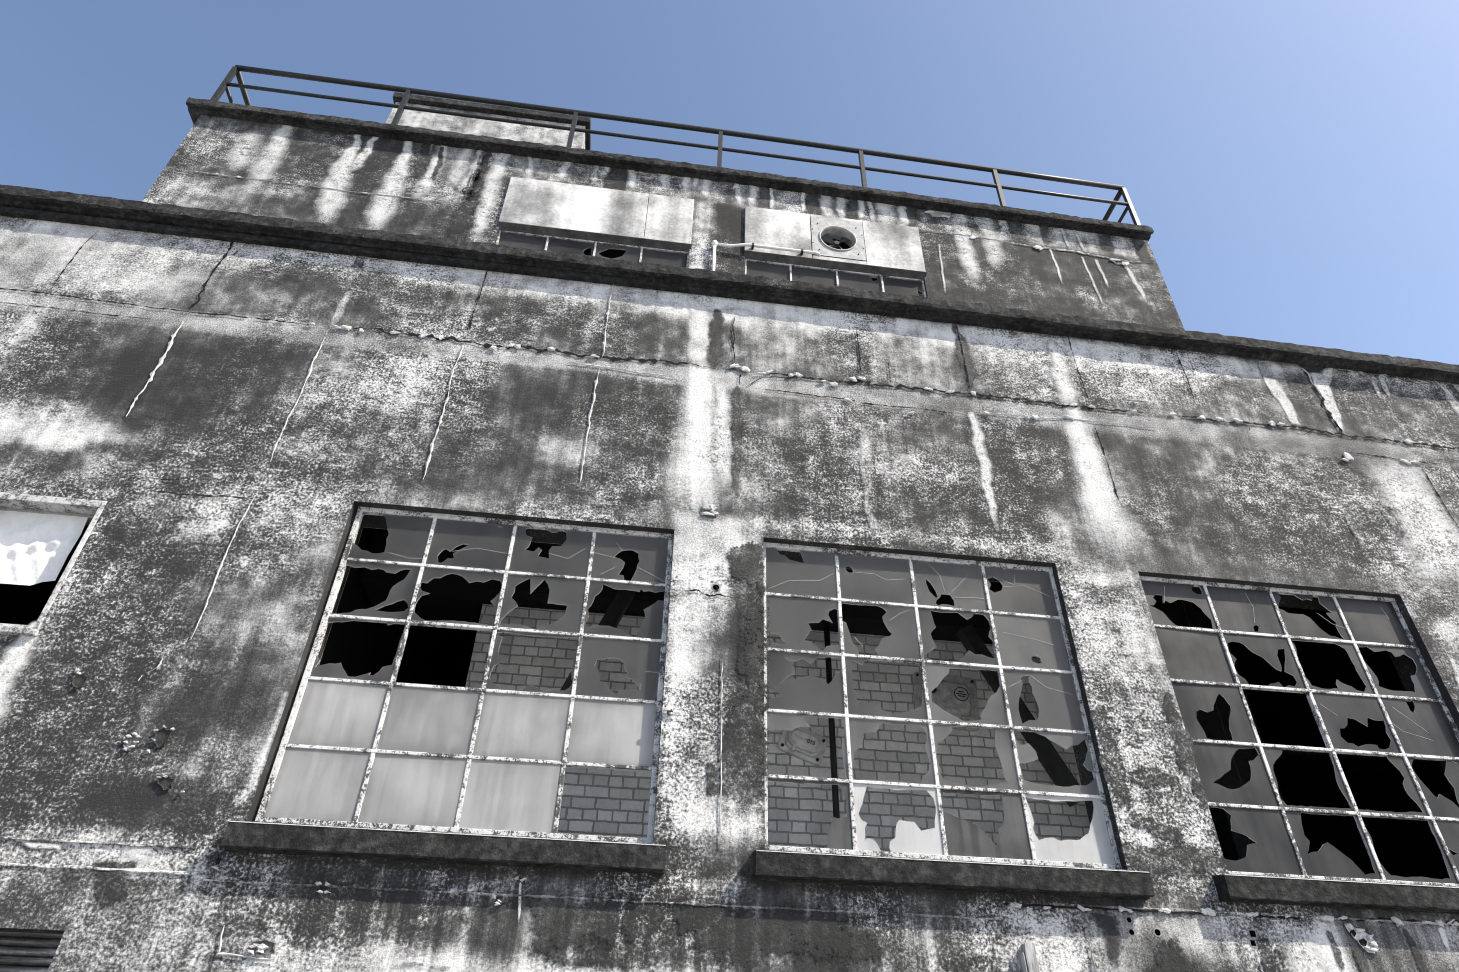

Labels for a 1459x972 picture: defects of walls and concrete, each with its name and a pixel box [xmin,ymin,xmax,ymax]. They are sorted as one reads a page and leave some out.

leakage [226,125,293,188]
leakage [315,134,379,223]
leakage [364,141,534,239]
leakage [590,165,637,191]
leakage [800,192,918,227]
leakage [939,213,1153,304]
leakage [663,298,745,511]
crack [0,236,1459,681]
leakage [968,412,998,527]
leakage [705,541,772,804]
leakage [93,860,137,908]
leakage [526,892,883,972]